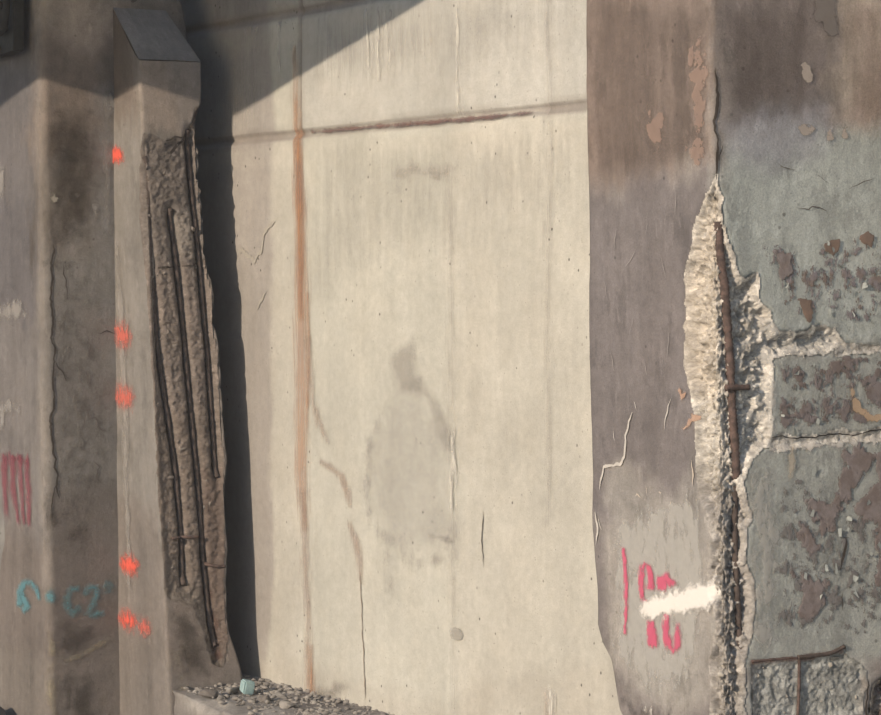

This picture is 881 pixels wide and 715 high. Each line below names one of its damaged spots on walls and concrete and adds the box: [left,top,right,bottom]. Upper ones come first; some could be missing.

crack [49,245,69,516]
spalling [139,107,229,667]
corrosion [294,97,530,517]
spalling [683,174,881,715]